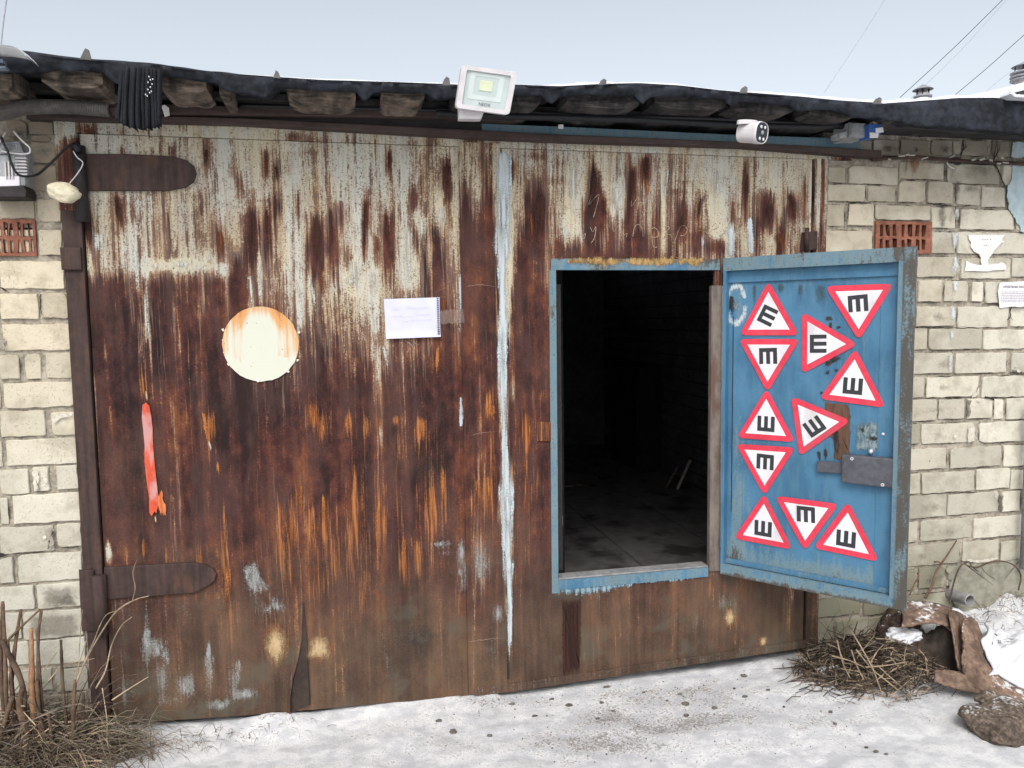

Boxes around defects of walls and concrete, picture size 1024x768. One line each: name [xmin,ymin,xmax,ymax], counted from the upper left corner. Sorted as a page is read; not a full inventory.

corrosion [246,208,270,255]
corrosion [312,209,333,259]
corrosion [361,203,389,250]
corrosion [529,193,545,244]
corrosion [582,170,606,227]
corrosion [628,157,649,224]
corrosion [567,257,703,267]
corrosion [202,413,212,449]
corrosion [429,470,445,519]
peeling [268,629,287,661]
peeling [310,639,327,658]